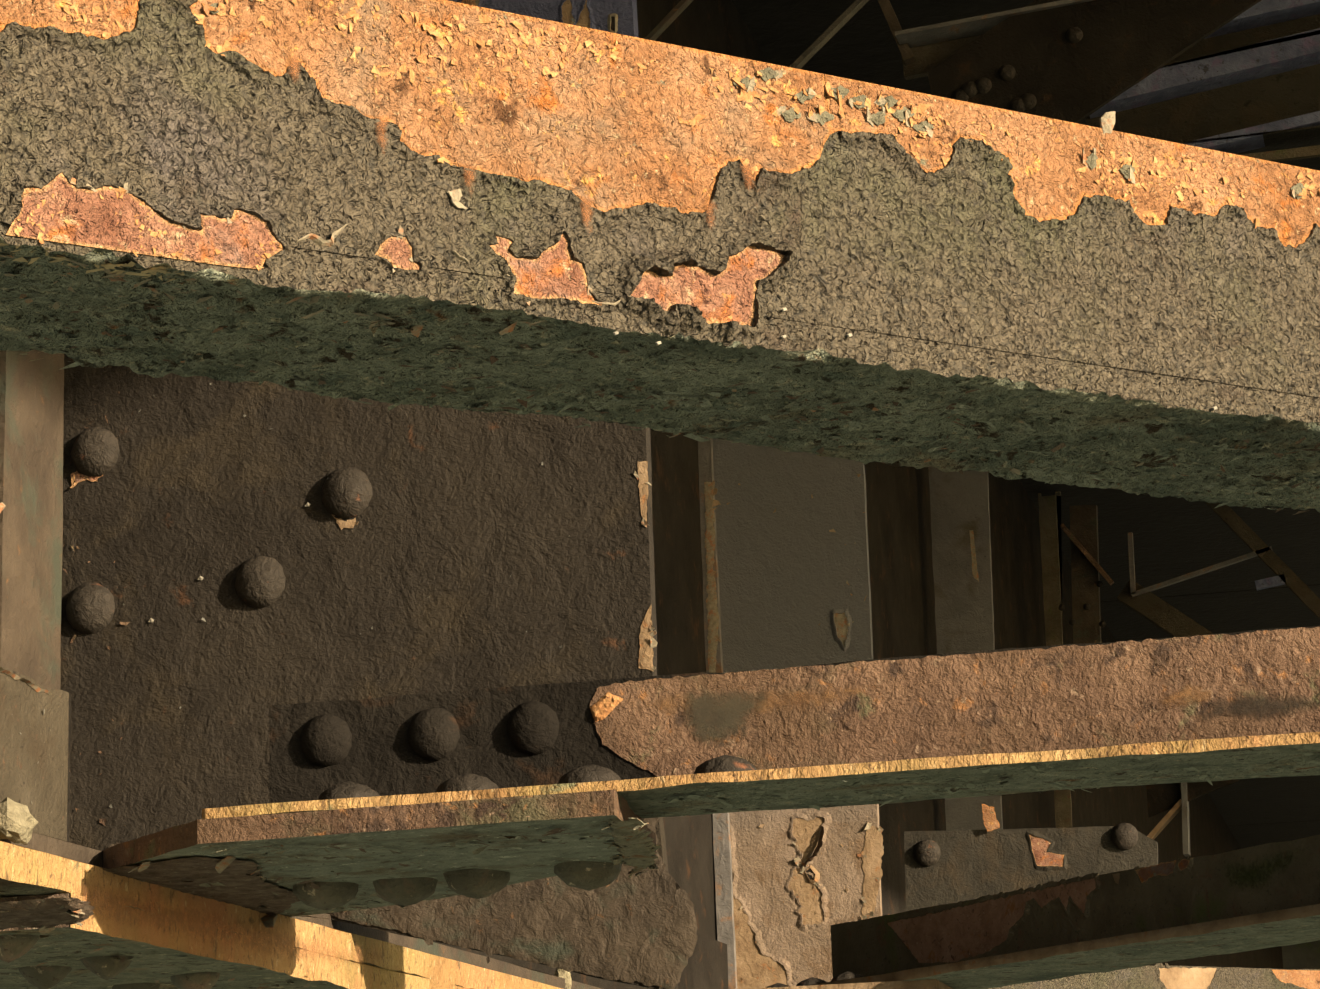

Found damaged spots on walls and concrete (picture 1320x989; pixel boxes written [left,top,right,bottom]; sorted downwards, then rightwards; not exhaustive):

corrosion [174,0,1320,255]
corrosion [367,225,428,281]
corrosion [478,225,798,346]
corrosion [590,605,1320,777]
corrosion [784,811,832,932]